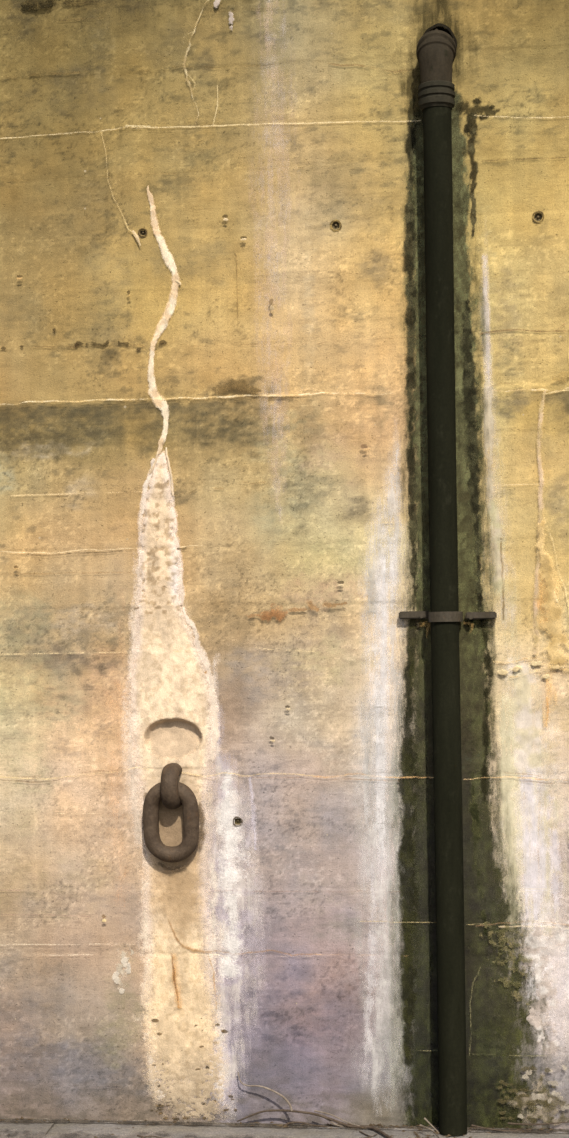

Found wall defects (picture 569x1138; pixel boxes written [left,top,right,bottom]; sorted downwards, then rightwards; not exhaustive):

damp [467,113,478,237]
damp [124,452,257,1121]
corrosion [197,803,206,849]
damp [363,0,460,1087]
damp [460,281,569,1055]